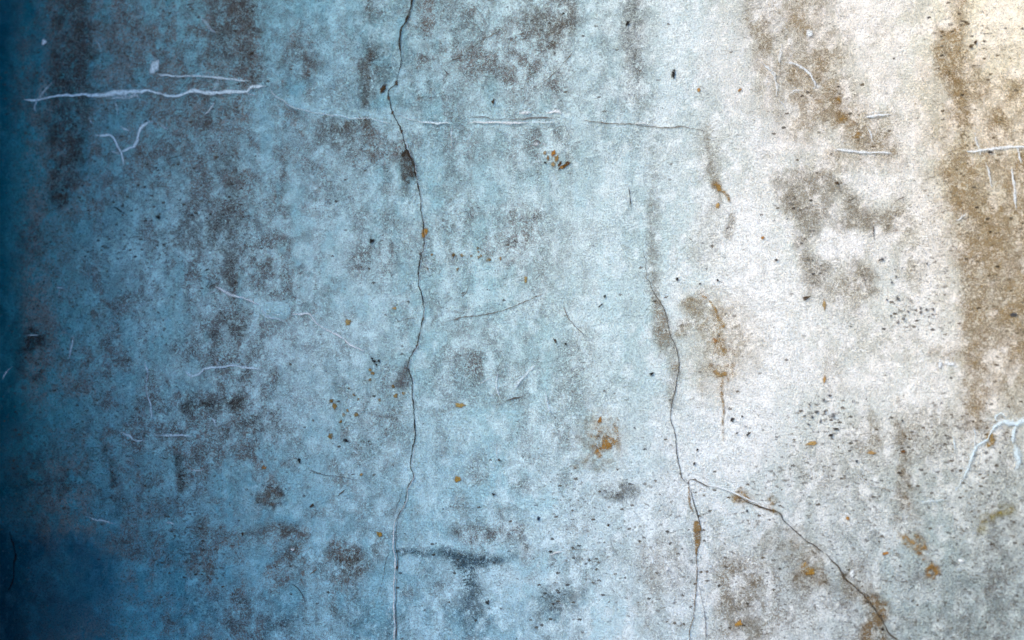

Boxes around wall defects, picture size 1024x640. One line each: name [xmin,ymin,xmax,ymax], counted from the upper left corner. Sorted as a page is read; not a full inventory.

damp [934,0,970,148]
corrosion [543,150,570,170]
crack [24,0,703,638]
corrosion [591,416,619,457]
corrosion [711,338,733,433]
crack [643,250,898,640]
damp [943,154,1024,363]